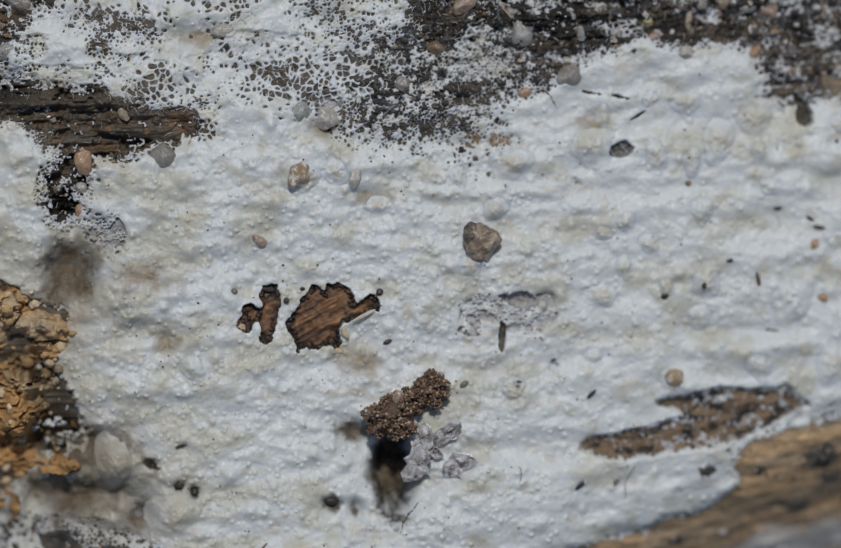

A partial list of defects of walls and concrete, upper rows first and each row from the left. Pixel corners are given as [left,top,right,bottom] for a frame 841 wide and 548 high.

damp [42,242,95,309]
damp [124,261,155,282]
peeling [236,281,381,354]
damp [63,431,99,463]
damp [339,423,370,440]
damp [371,440,402,489]
damp [27,471,96,528]